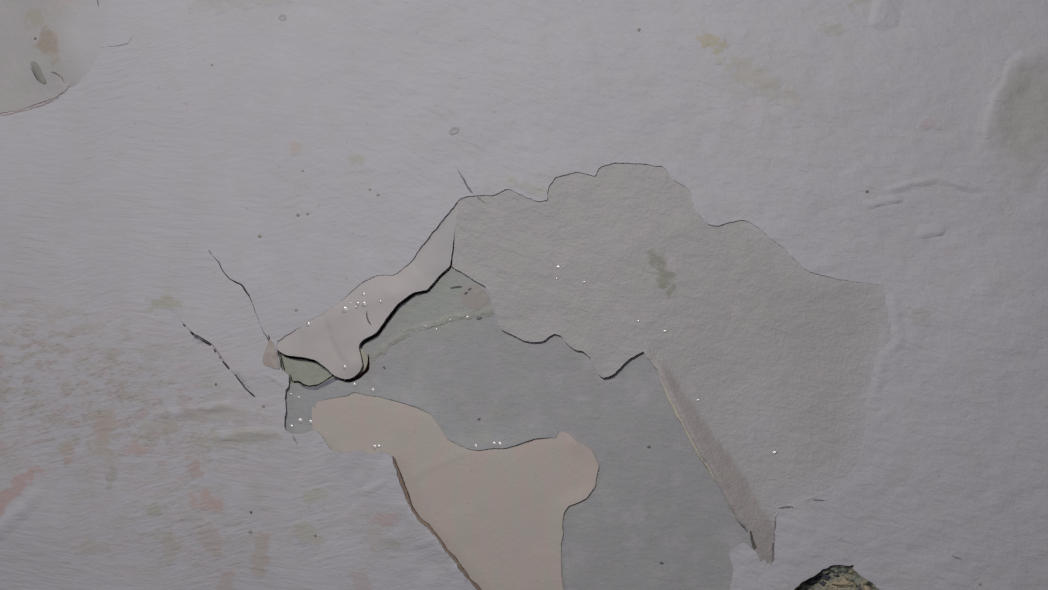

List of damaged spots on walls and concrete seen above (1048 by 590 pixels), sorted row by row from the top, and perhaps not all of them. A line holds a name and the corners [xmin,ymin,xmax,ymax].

crack [183,324,255,397]
peeling [262,163,891,590]